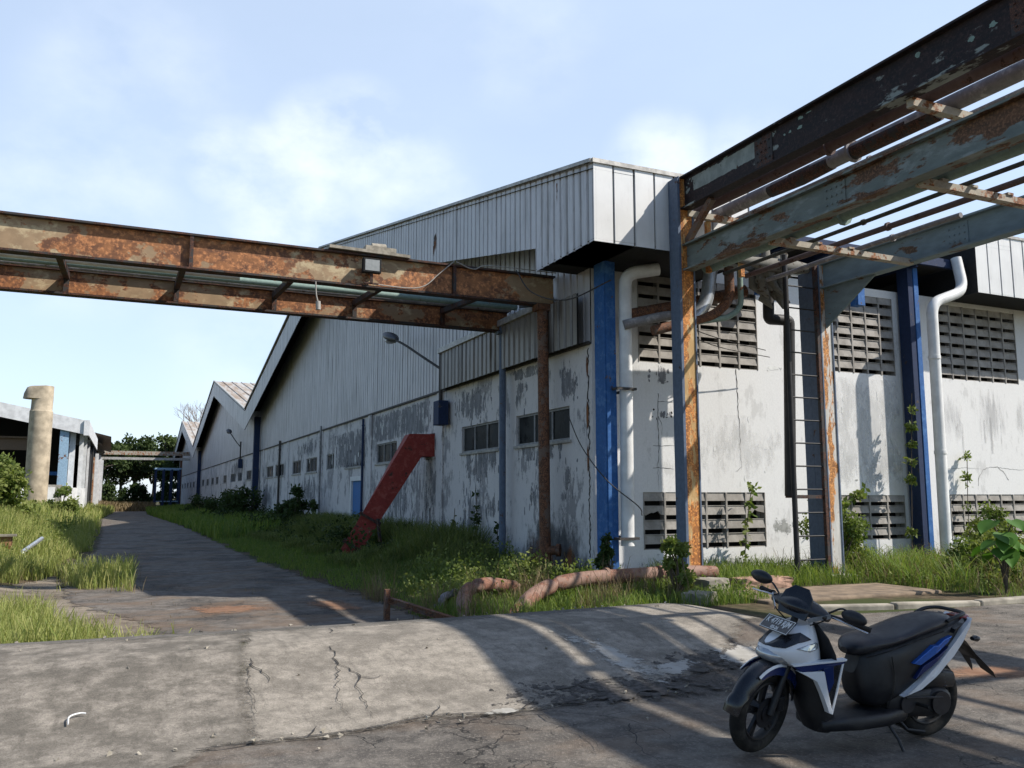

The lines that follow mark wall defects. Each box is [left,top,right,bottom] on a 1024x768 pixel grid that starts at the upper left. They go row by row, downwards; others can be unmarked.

peeling [686,142,755,194]
crack [196,628,683,760]